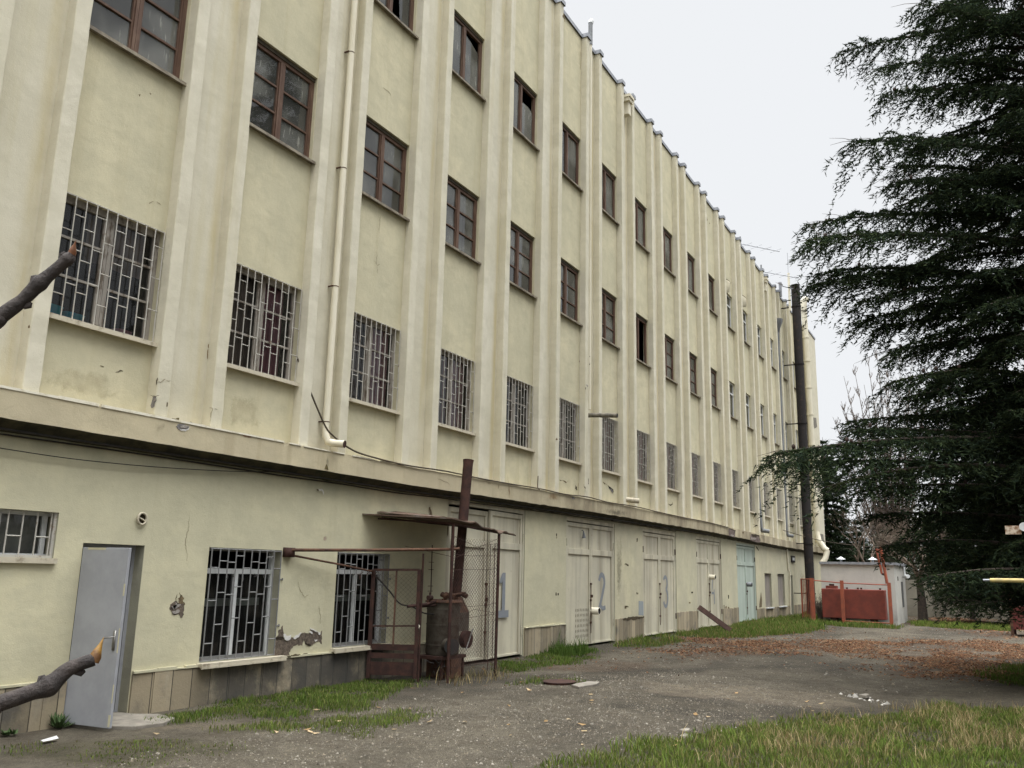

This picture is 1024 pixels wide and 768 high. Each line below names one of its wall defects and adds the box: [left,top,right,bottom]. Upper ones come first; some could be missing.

flaking render [169,593,185,618]
flaking render [274,626,322,656]